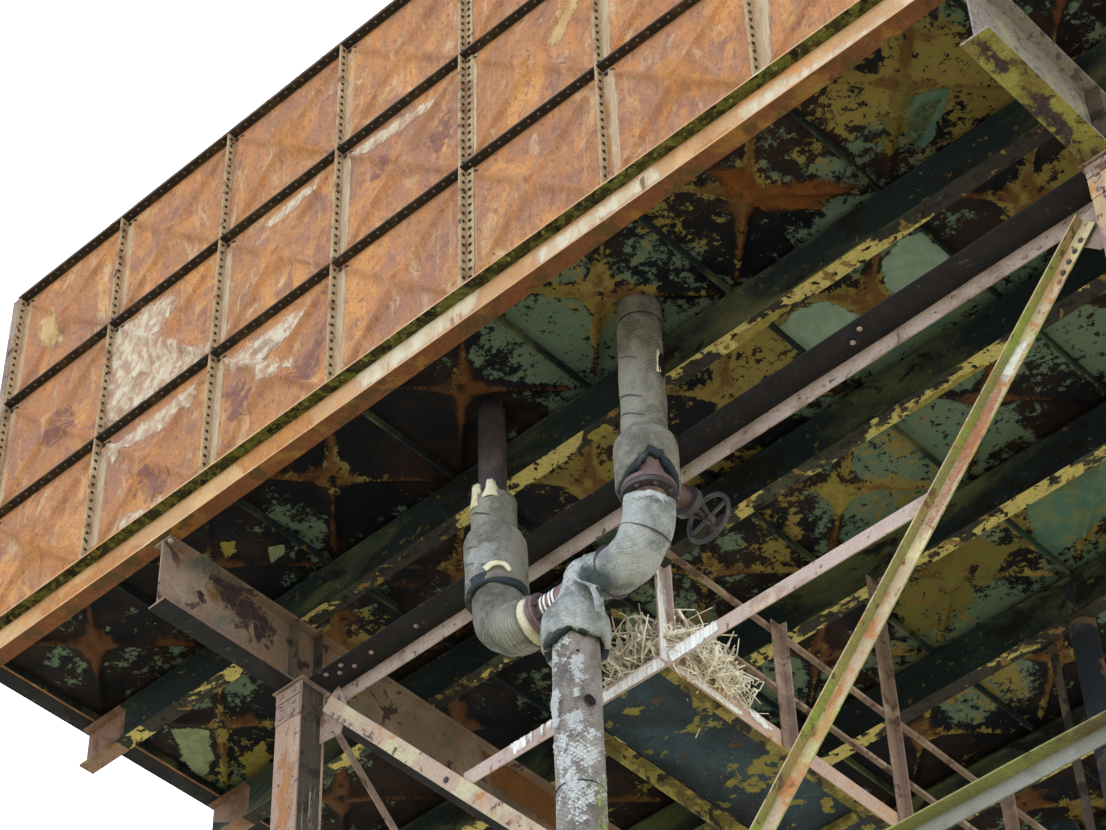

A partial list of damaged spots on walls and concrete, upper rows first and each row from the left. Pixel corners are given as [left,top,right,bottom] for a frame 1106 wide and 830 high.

peeling [881,232,950,294]
peeling [104,294,210,425]
peeling [733,301,860,352]
peeling [854,284,997,379]
corrosion [236,412,311,473]
corrosion [929,388,1001,528]
corrosion [40,545,140,616]
corrosion [199,568,284,654]
peeling [895,460,1106,640]
peeling [551,654,592,812]
corrosion [276,745,293,830]
corrosion [490,765,556,828]